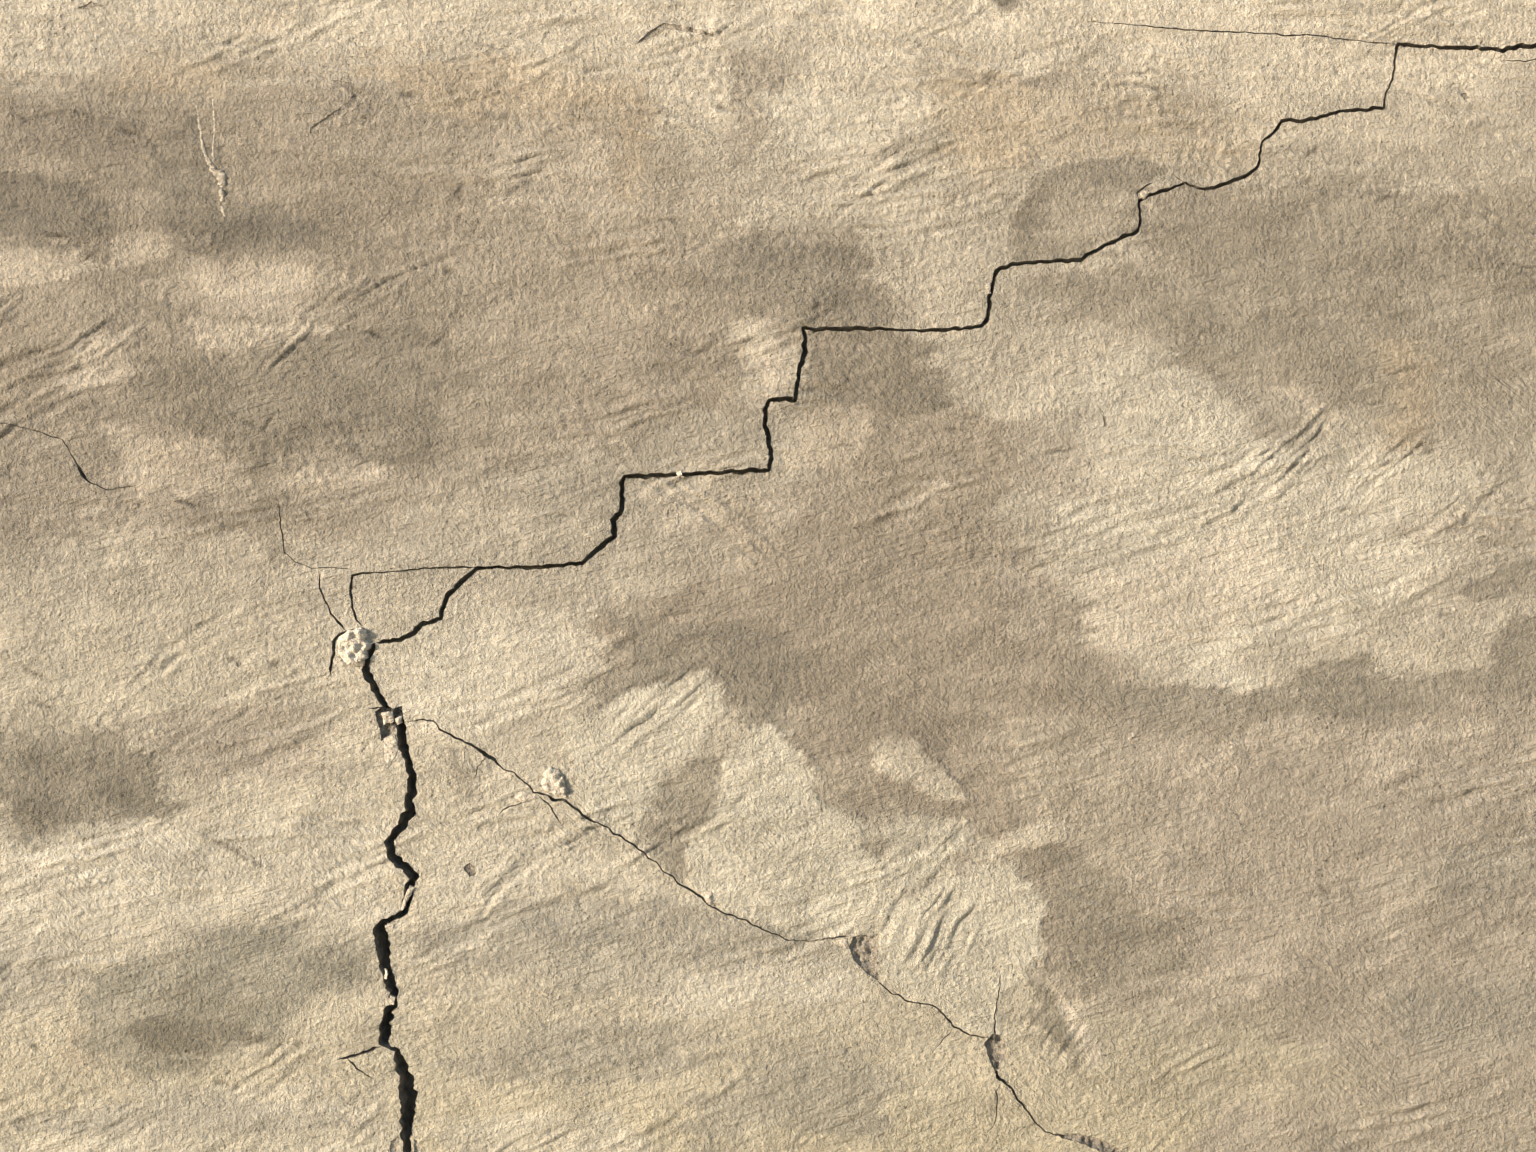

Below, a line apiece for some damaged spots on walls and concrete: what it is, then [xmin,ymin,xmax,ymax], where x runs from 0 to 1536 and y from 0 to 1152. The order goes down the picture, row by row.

leakage [0,705,191,854]
leakage [0,86,342,266]
leakage [118,305,497,565]
crack [278,504,348,569]
leakage [568,598,821,886]
leakage [672,207,967,472]
crack [319,23,1536,1152]
leakage [970,146,1536,455]
leakage [1040,555,1536,743]
leakage [1019,843,1215,1083]